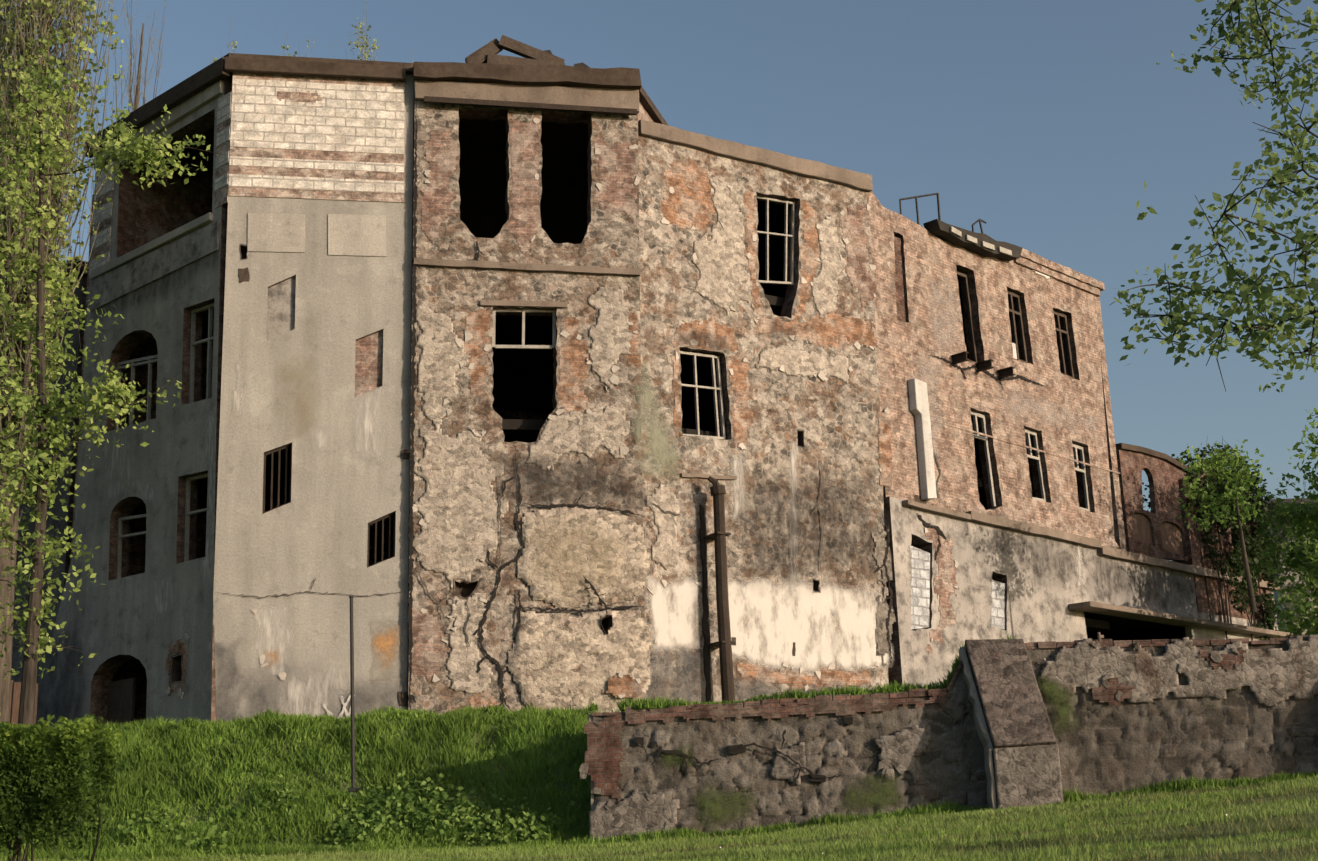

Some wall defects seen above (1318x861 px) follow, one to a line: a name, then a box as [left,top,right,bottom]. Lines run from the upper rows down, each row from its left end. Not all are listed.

flaking render [660,157,878,450]
crack [218,104,681,711]
flaking render [166,633,190,699]
flaking render [252,607,292,680]
peeling [579,526,945,810]
flaking render [1038,632,1318,706]
crack [644,729,842,786]